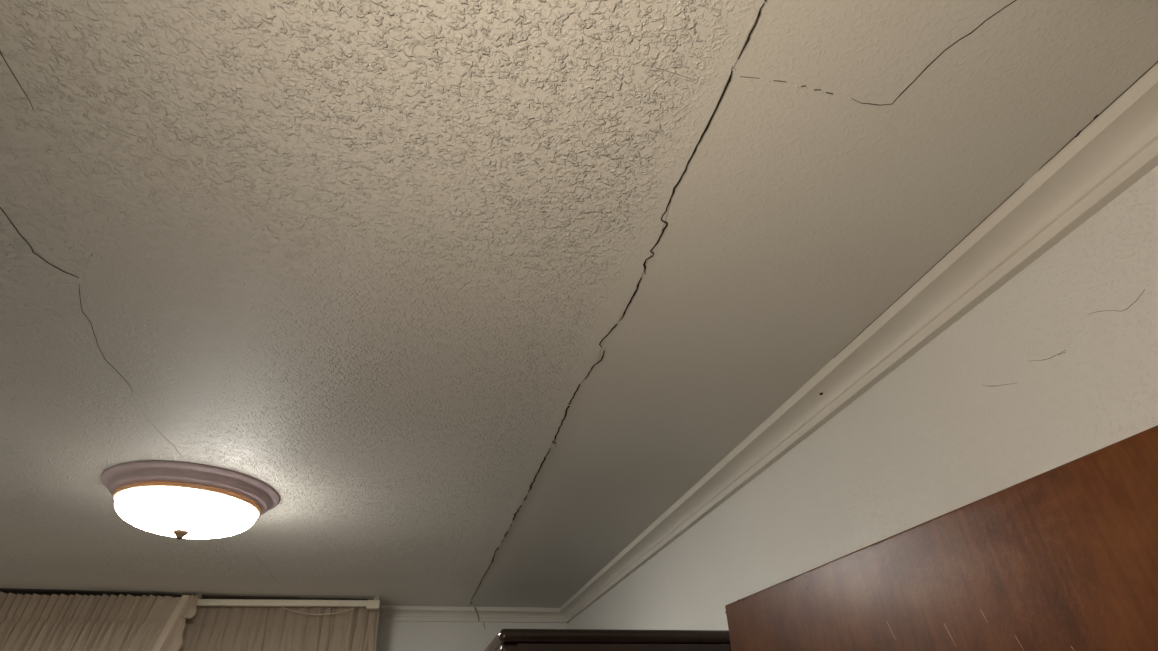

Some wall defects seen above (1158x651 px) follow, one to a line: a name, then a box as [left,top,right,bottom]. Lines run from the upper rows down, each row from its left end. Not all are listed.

crack [0,52,34,111]
crack [0,207,182,457]
crack [470,0,1016,630]